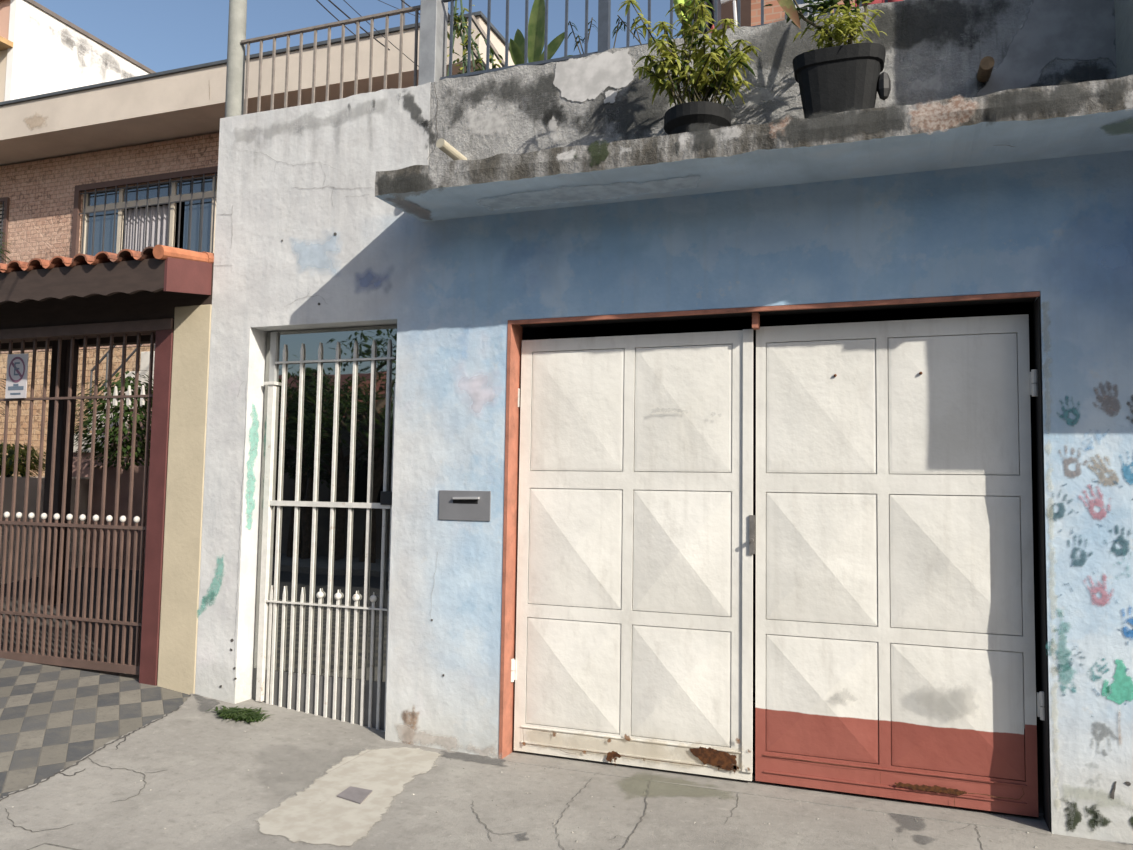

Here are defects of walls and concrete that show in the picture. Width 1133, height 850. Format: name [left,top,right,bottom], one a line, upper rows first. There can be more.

leakage [61,30,133,78]
flaking render [553,48,634,103]
leakage [447,72,669,167]
rust [606,734,630,765]
rust [690,738,751,773]
crack [523,730,702,850]
leakage [1065,802,1110,832]